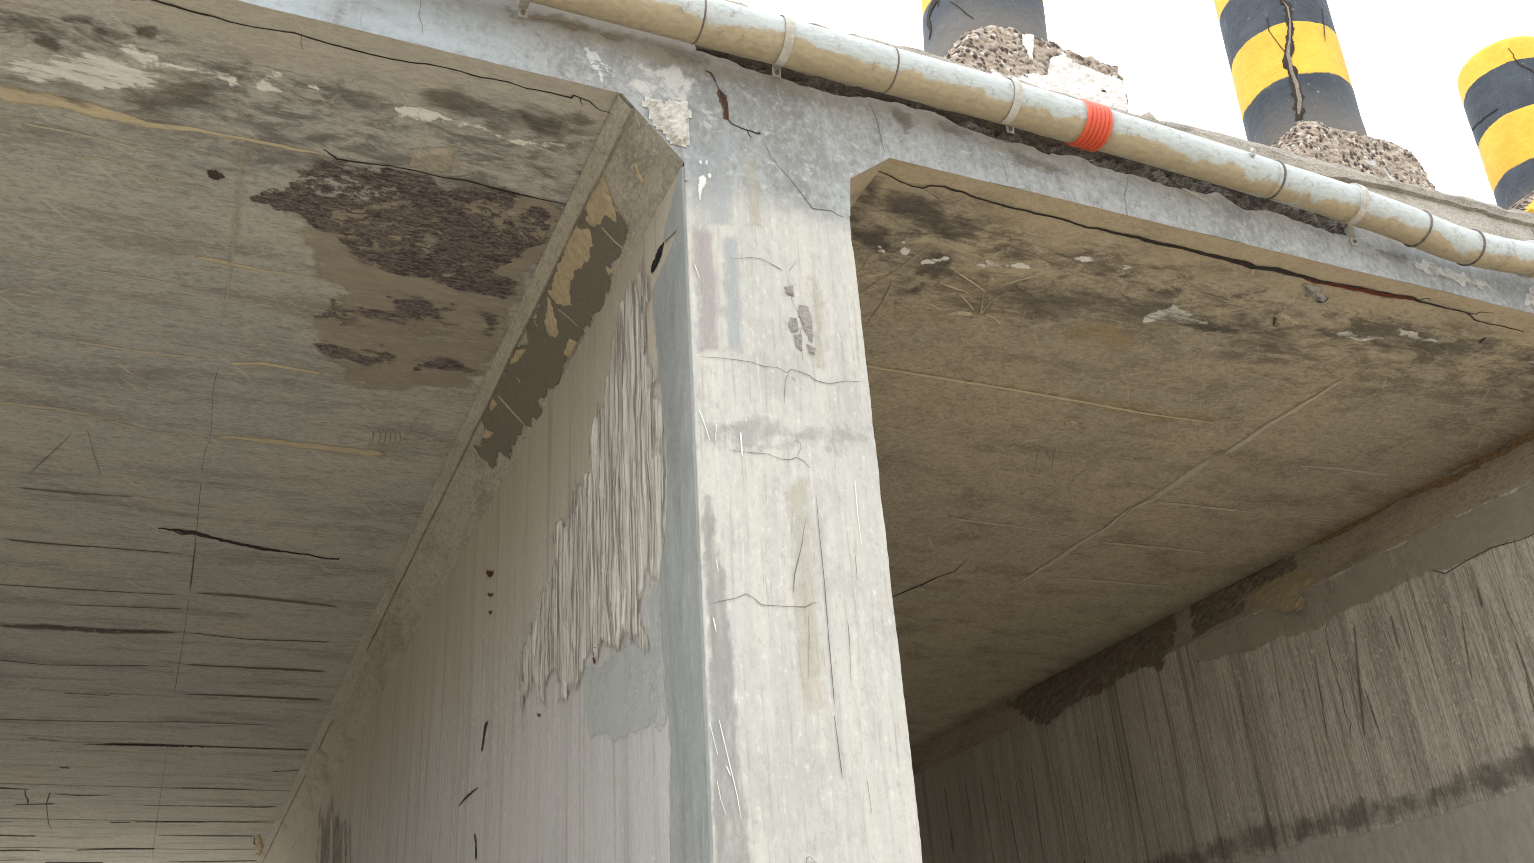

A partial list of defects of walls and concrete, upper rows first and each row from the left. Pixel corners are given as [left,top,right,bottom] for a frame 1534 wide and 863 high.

water stain [0,18,283,110]
water stain [385,90,594,148]
water stain [531,14,634,40]
spalling [583,47,694,147]
crack [705,70,843,217]
crack [1267,0,1325,121]
spalling [250,158,619,389]
crack [870,103,1532,332]
crack [710,357,859,397]
peeling [516,262,665,710]
crack [158,528,339,560]
water stain [1343,627,1382,739]